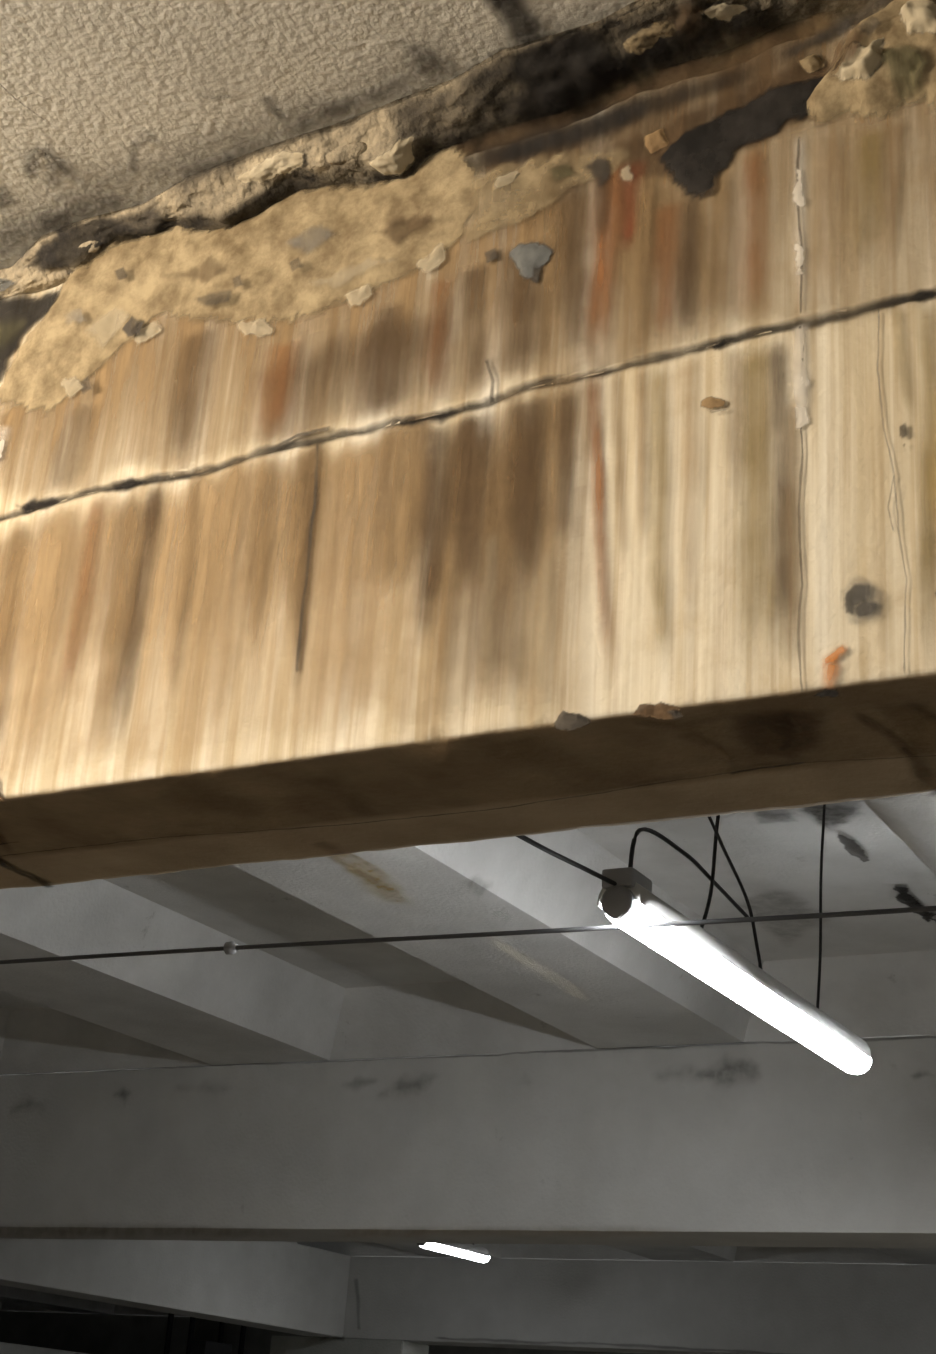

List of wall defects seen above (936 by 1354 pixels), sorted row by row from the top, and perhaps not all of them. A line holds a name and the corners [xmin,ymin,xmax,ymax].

damp [29,151,317,269]
peeling [0,0,936,412]
damp [369,0,891,263]
damp [0,179,589,470]
crack [0,140,936,520]
corrosion [144,493,158,539]
damp [0,384,575,677]
corrosion [593,427,604,600]
crack [796,404,804,588]
crack [885,435,900,537]
corrosion [825,646,845,684]
crack [901,615,909,671]